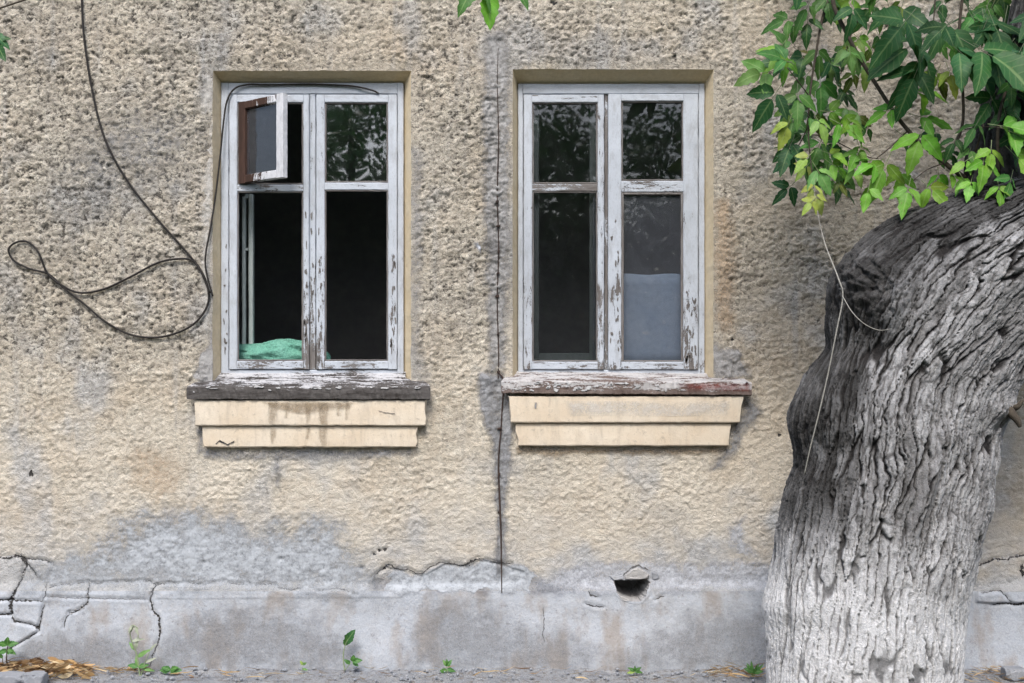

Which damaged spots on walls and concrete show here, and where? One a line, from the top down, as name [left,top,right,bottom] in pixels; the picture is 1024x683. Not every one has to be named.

peeling [303,259,322,363]
peeling [685,291,697,364]
peeling [513,381,641,392]
water stain [22,373,769,605]
crack [0,554,349,666]
crack [373,558,511,577]
spalling [610,564,659,605]
crack [979,553,1024,606]